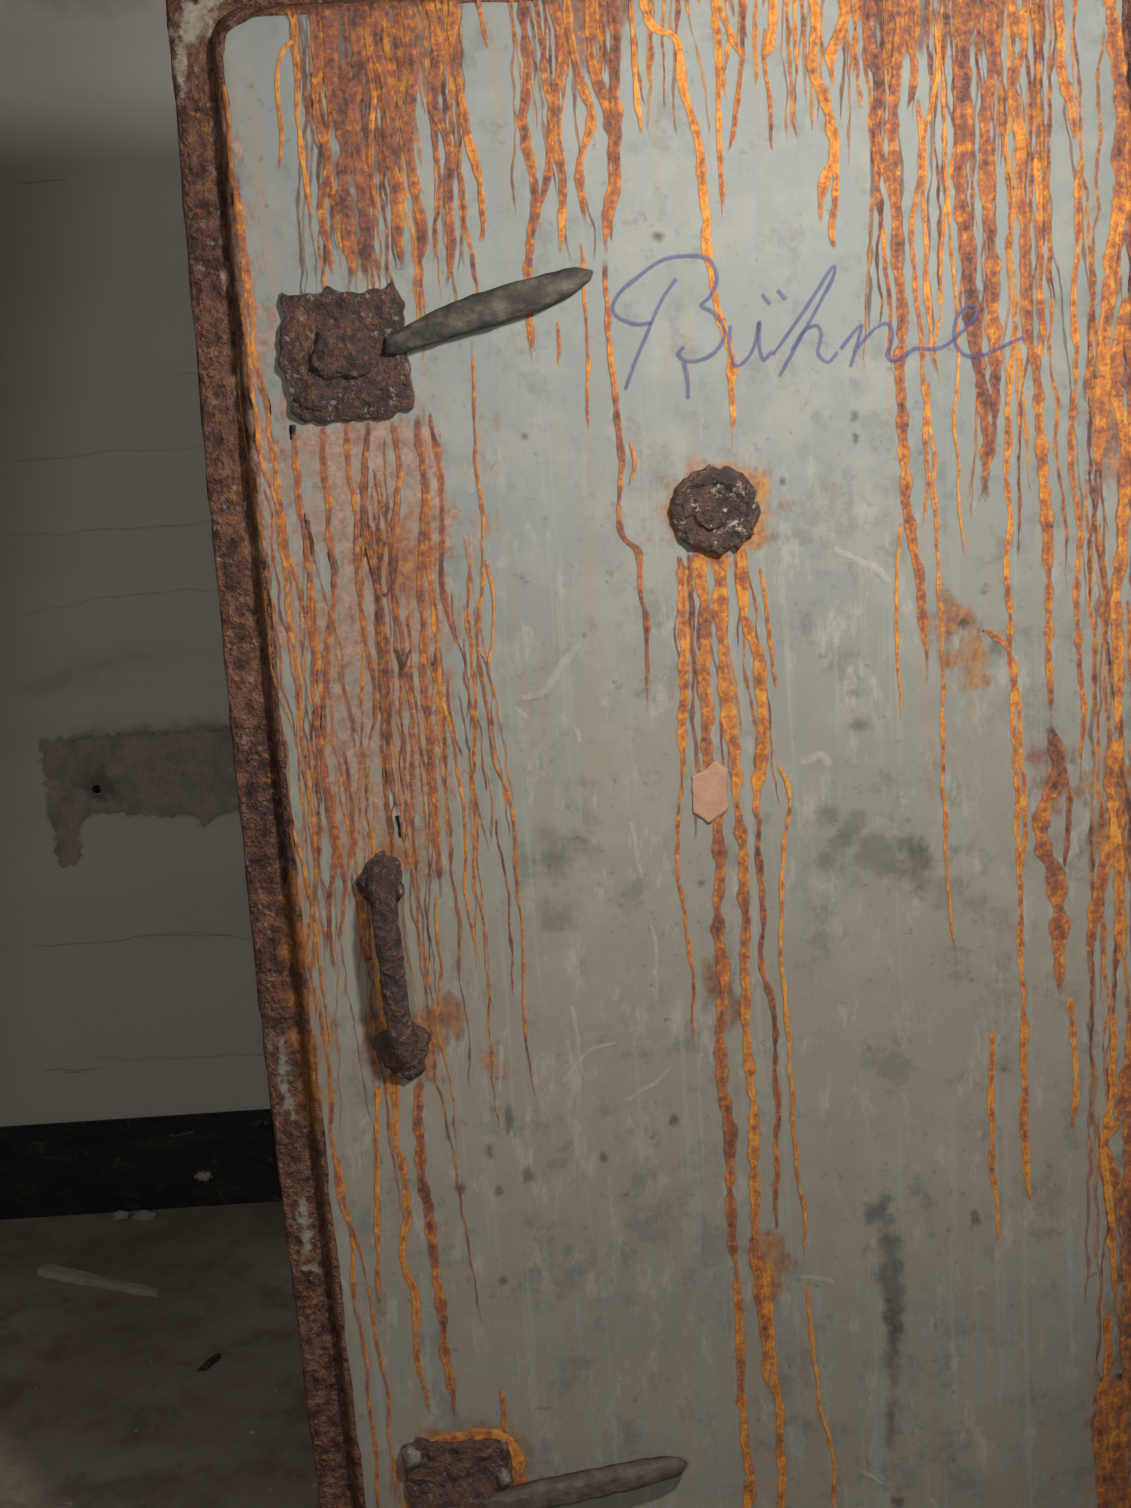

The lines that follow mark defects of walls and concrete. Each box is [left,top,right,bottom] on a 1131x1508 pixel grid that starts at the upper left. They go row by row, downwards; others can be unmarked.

peeling [40,726,239,867]
rust [222,83,535,1508]
rust [275,0,489,319]
rust [509,0,1131,1508]